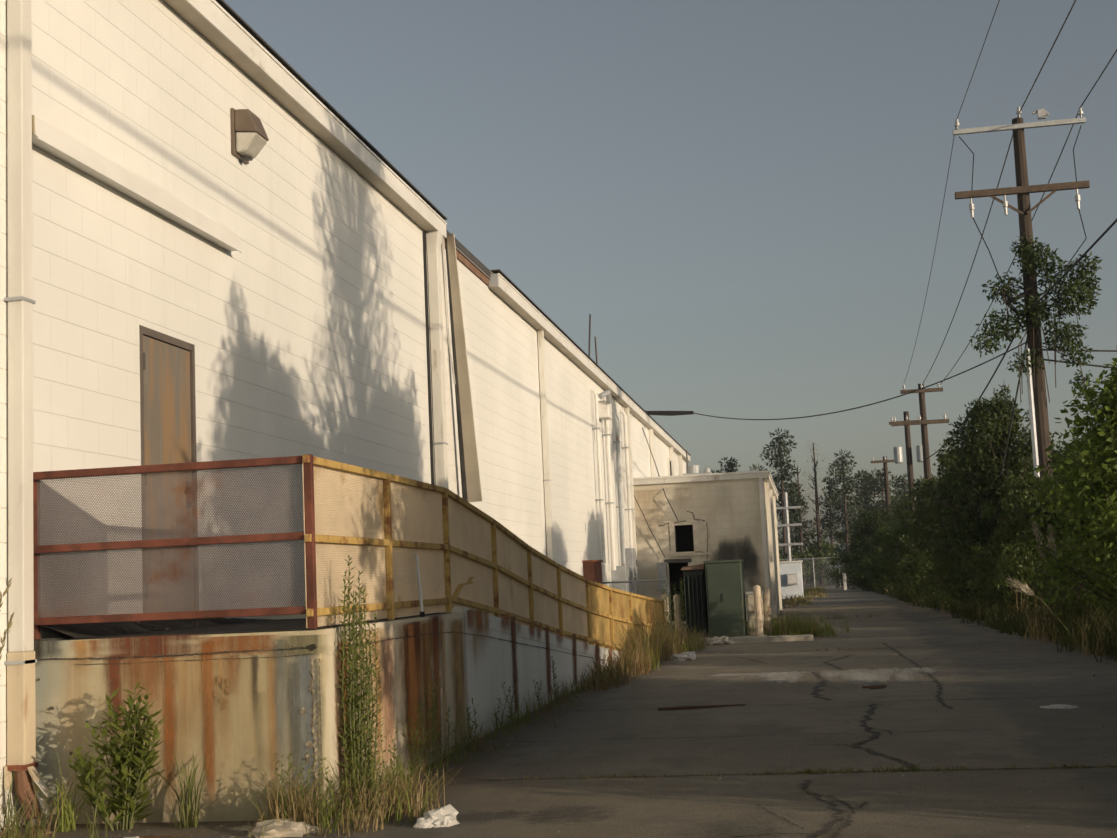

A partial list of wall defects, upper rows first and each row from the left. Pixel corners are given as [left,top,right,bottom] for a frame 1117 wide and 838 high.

rust [107,635,275,789]
rust [340,630,394,792]
rust [405,610,488,752]
rust [502,614,519,711]
rust [530,621,621,697]
crack [811,654,855,700]
crack [808,704,915,768]
crack [882,643,953,708]
crack [733,780,867,838]